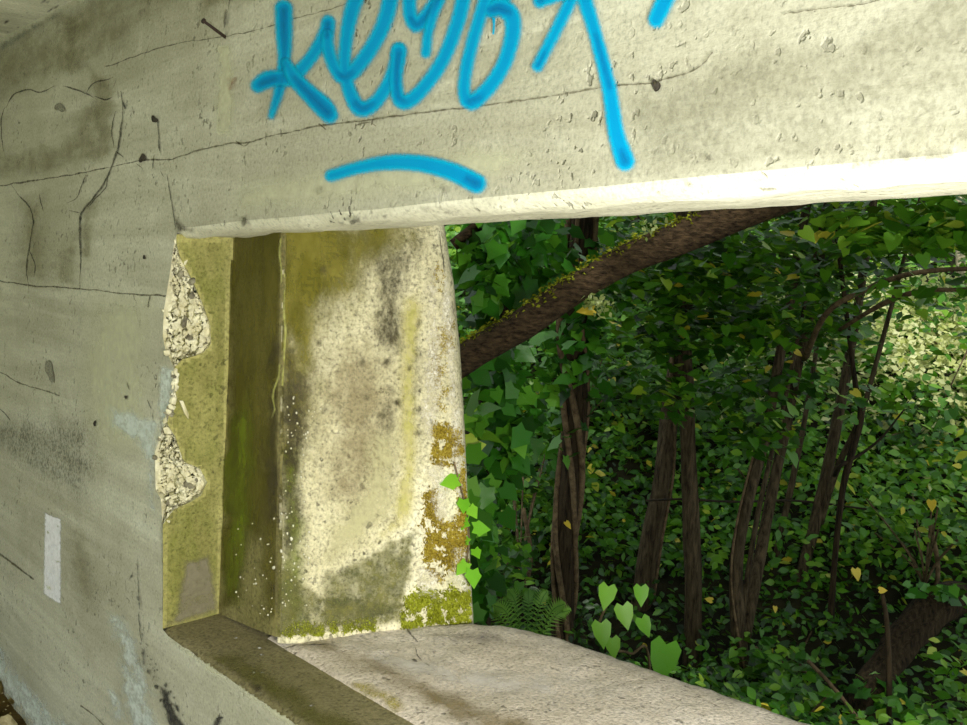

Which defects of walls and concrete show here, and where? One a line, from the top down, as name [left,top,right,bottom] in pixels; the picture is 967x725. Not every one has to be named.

crack [1,79,175,290]
spalling [152,238,211,524]